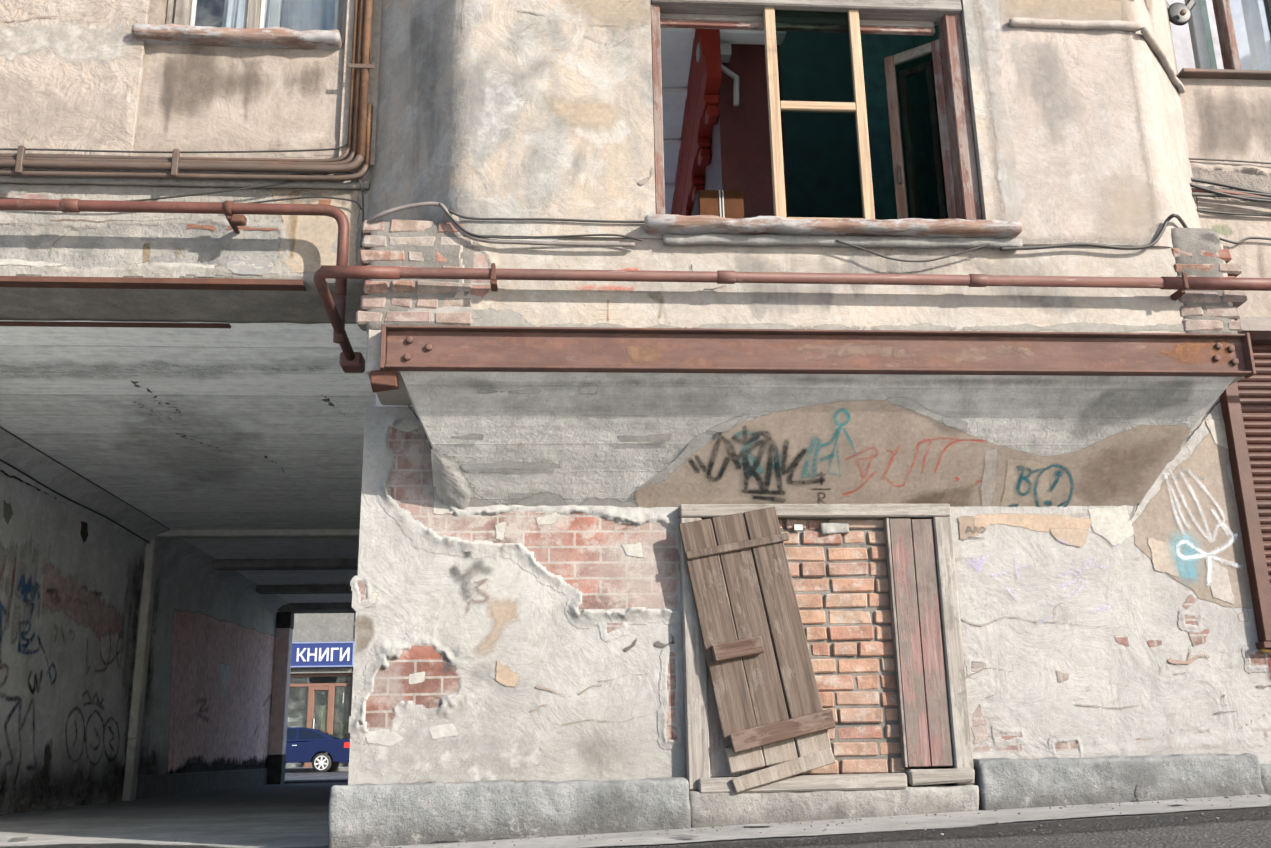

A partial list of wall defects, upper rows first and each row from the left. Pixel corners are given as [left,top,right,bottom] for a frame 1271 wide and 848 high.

leakage [162,45,260,109]
leakage [1201,97,1271,151]
spalling [406,213,625,328]
spalling [648,322,1185,333]
peeling [374,400,1253,647]
spalling [350,573,379,611]
spalling [348,600,520,744]
spalling [657,643,685,750]
spalling [964,654,991,678]
spalling [1242,646,1271,673]
spalling [1048,734,1086,758]